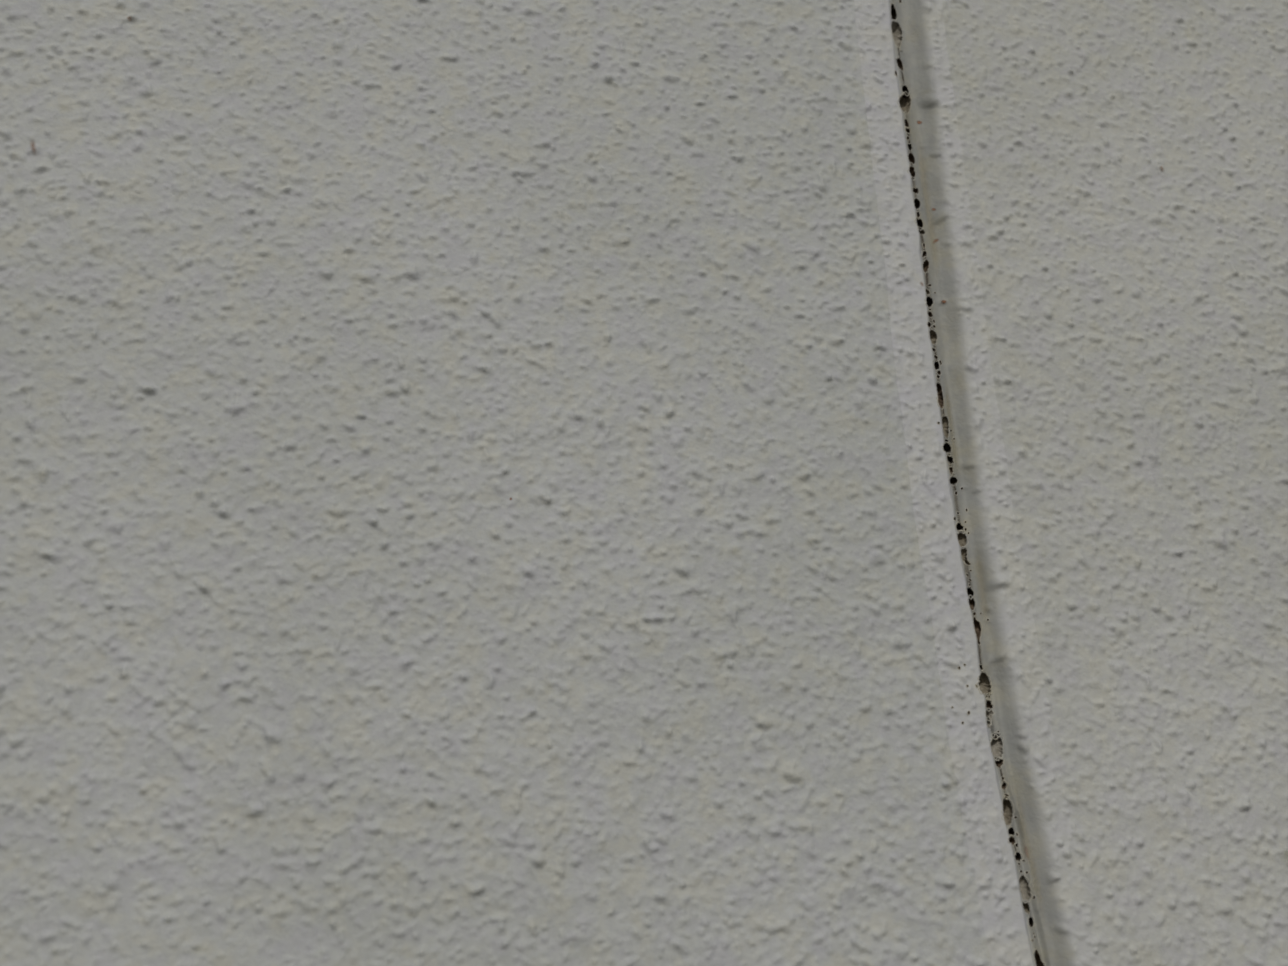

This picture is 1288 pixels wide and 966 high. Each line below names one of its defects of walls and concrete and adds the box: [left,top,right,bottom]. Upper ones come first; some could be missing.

crack [890,0,1036,942]